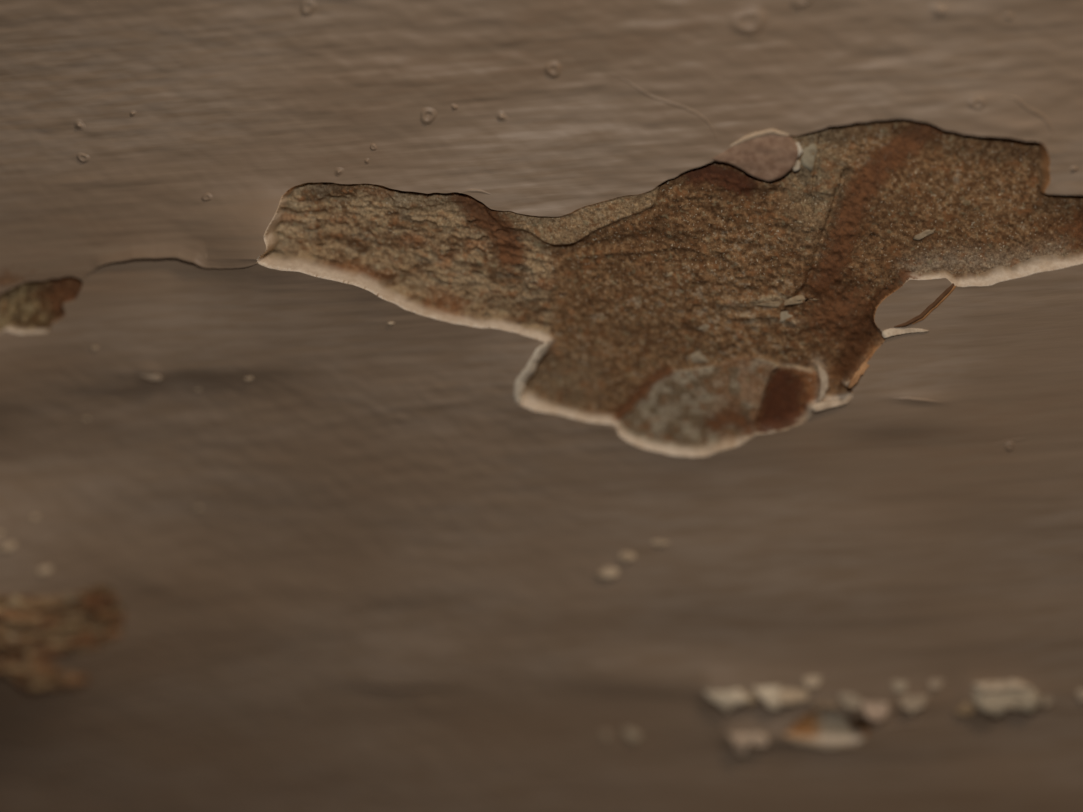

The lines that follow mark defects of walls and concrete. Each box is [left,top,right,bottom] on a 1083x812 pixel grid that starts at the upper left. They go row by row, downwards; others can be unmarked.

spalling [0,119,1083,457]
corrosion [834,270,915,380]
peeling [0,584,125,691]
peeling [727,732,768,756]
peeling [704,675,944,749]
peeling [955,680,1053,718]